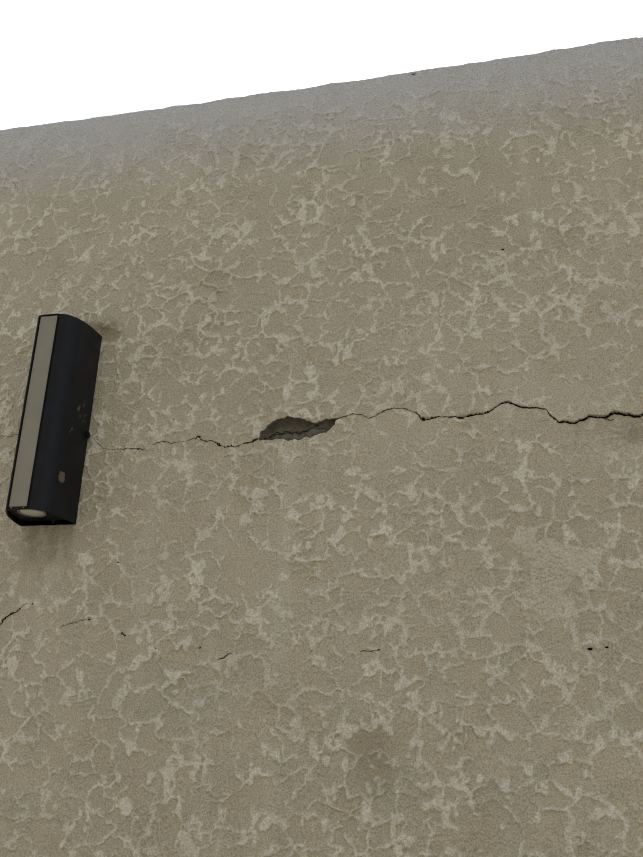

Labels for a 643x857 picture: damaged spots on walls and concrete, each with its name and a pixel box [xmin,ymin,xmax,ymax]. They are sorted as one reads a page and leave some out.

crack [338,402,643,424]
spalling [259,416,337,441]